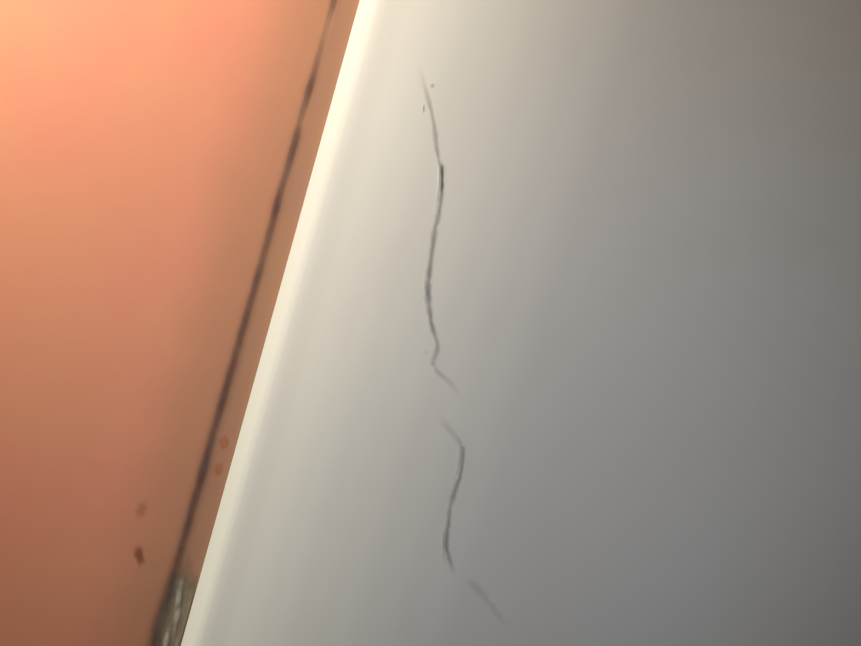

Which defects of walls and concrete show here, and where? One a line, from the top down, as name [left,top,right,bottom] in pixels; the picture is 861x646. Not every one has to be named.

crack [436,162,444,196]